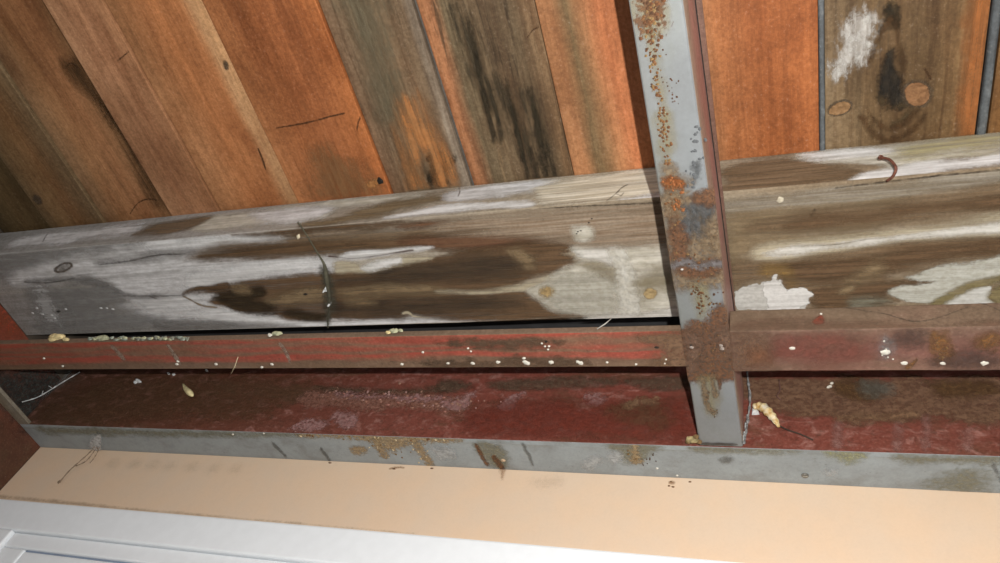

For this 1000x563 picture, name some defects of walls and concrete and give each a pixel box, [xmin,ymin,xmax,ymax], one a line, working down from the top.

water stain [880,3,900,32]
water stain [7,0,679,334]
peeling [734,274,814,310]
corrosion [633,0,1000,426]
water stain [721,48,1000,191]
water stain [731,185,1000,309]